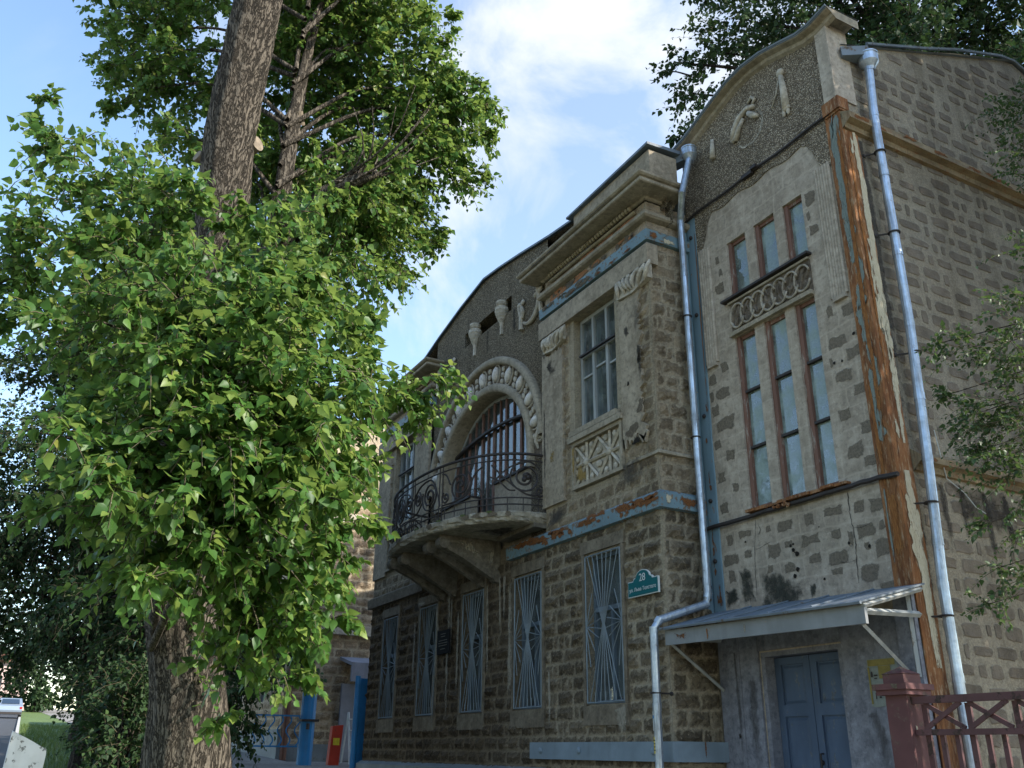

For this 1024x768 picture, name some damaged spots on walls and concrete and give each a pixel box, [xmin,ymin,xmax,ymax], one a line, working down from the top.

spalling [542,217,634,312]
peeling [826,115,906,466]
mould [727,569,816,607]
crack [840,491,868,583]
peeling [904,470,942,668]